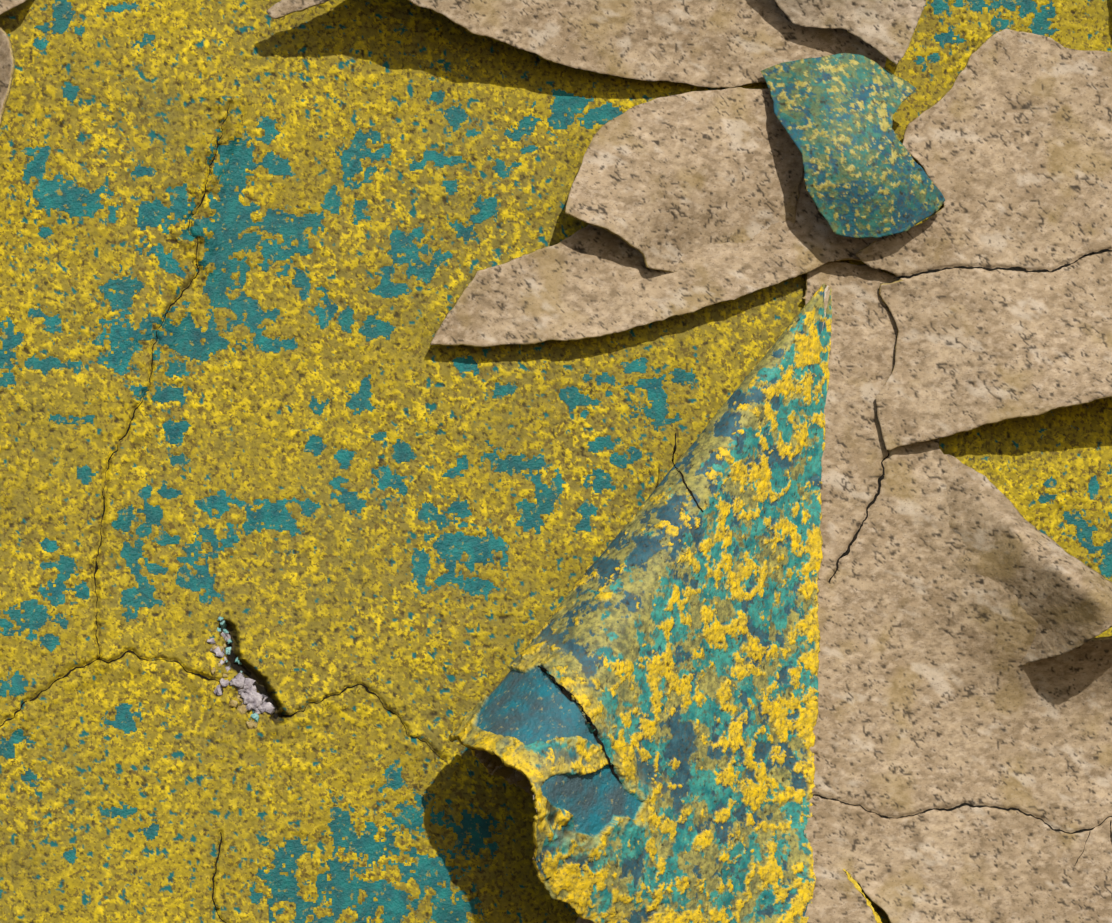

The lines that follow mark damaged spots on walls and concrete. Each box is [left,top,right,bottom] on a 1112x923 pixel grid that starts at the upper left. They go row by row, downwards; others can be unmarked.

peeling [266,0,329,20]
peeling [0,0,26,127]
spalling [368,225,453,298]
crack [894,249,1112,279]
crack [0,103,230,727]
peeling [408,0,1112,923]
crack [829,453,889,582]
crack [281,684,444,760]
crack [813,794,1112,866]